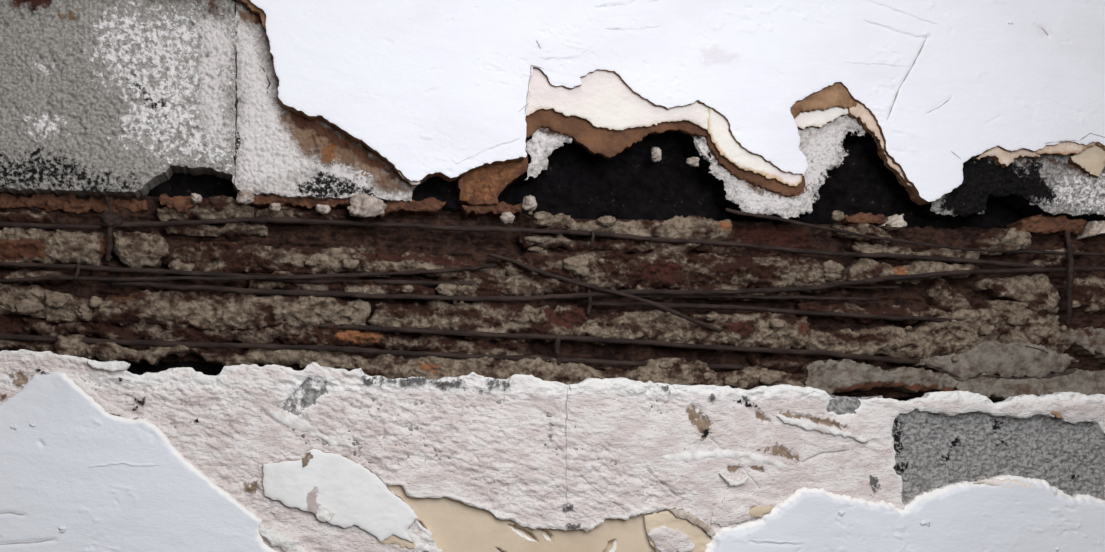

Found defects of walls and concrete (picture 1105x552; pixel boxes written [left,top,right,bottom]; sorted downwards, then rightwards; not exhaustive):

peeling [235,0,266,31]
peeling [525,69,805,197]
peeling [790,83,912,189]
peeling [973,141,1105,177]
spalling [0,195,1105,400]
peeling [66,375,139,419]
peeling [777,415,869,442]
peeling [263,448,443,552]
spalling [509,525,551,542]
peeling [643,473,774,552]
peeling [974,478,1036,487]